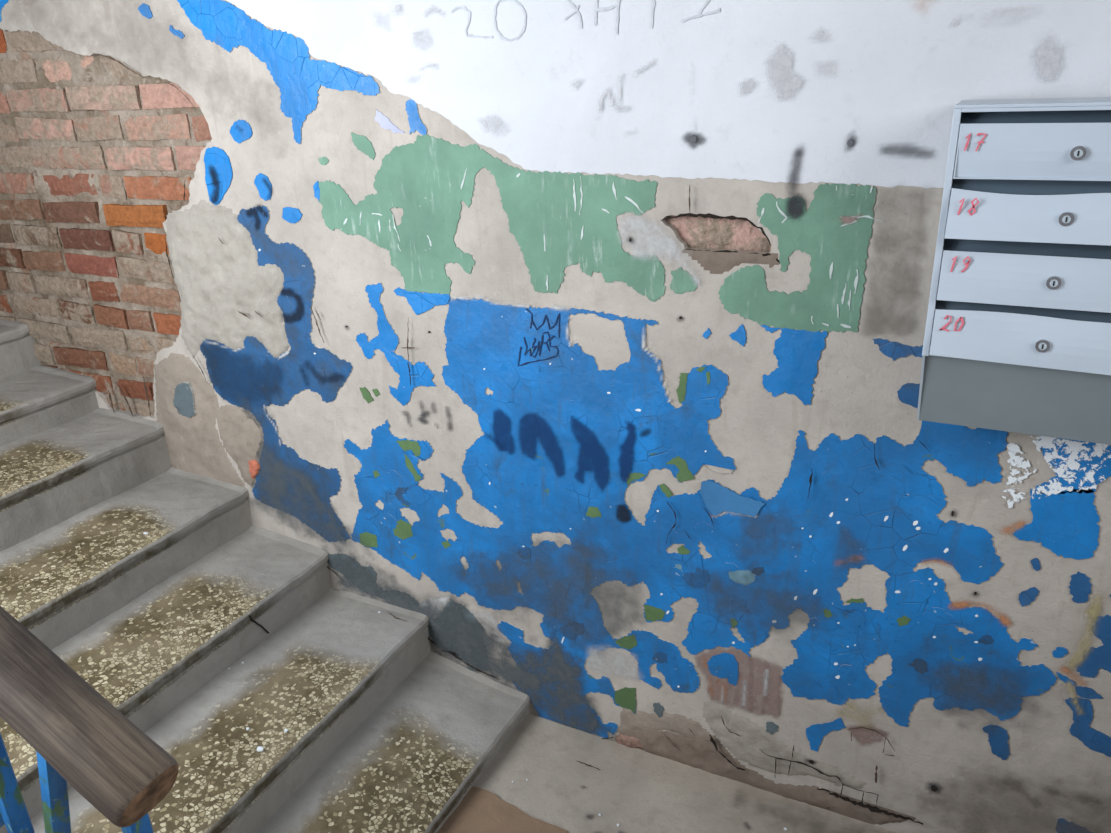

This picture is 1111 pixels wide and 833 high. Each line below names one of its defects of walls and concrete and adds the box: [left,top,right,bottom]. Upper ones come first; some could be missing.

peeling [138,3,153,19]
peeling [169,0,380,144]
water stain [621,218,678,257]
peeling [0,30,1057,727]
peeling [1012,438,1111,603]
water stain [421,597,450,611]
peeling [1052,647,1068,658]
peeling [1075,614,1111,678]
peeling [1056,672,1111,757]
crack [664,716,923,825]